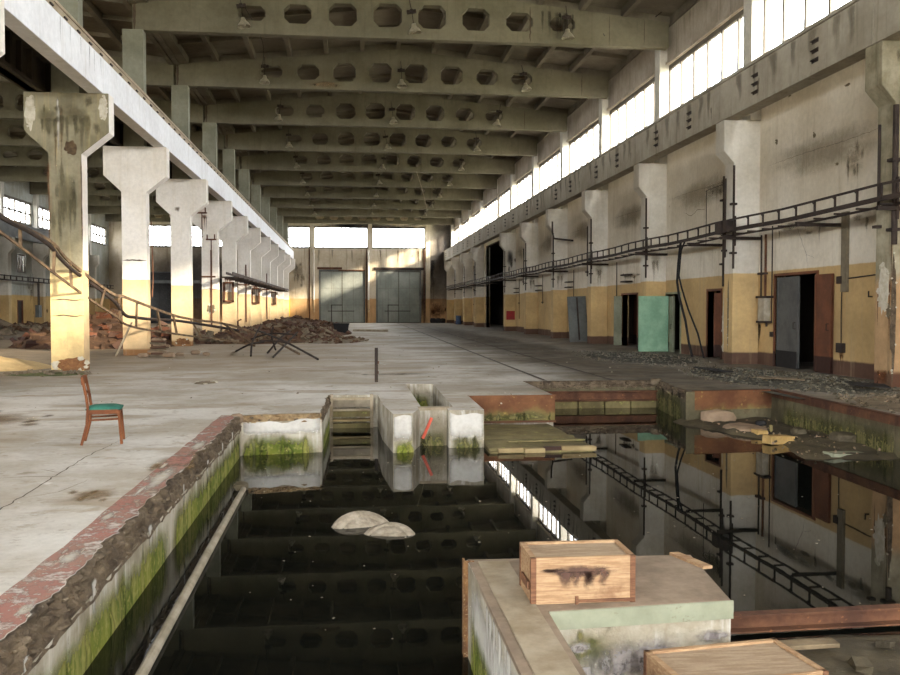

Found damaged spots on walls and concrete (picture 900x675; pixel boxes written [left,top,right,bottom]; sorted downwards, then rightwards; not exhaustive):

leakage [41,99,99,140]
spalling [64,140,77,155]
leakage [52,167,76,225]
spalling [876,252,898,380]
spalling [51,356,90,371]
crack [0,441,118,510]
leakage [70,491,108,500]
spalling [0,395,383,675]